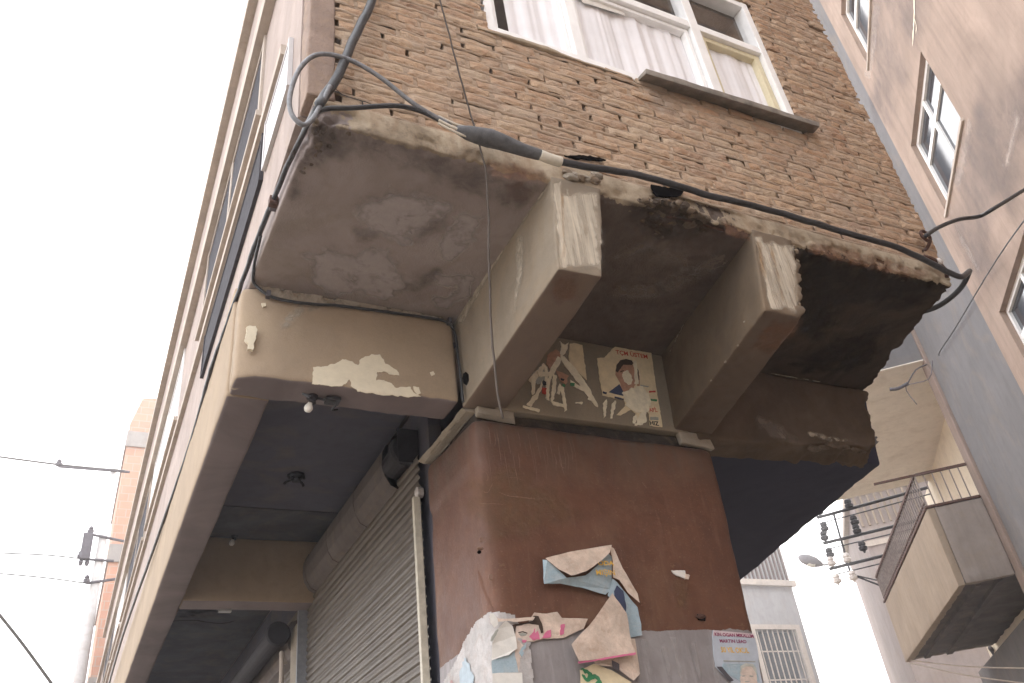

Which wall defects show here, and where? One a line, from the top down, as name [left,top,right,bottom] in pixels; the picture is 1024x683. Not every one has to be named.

leakage [358,196,481,261]
spalling [628,184,728,239]
leakage [305,248,405,299]
peeling [244,326,257,352]
peeling [312,354,421,398]